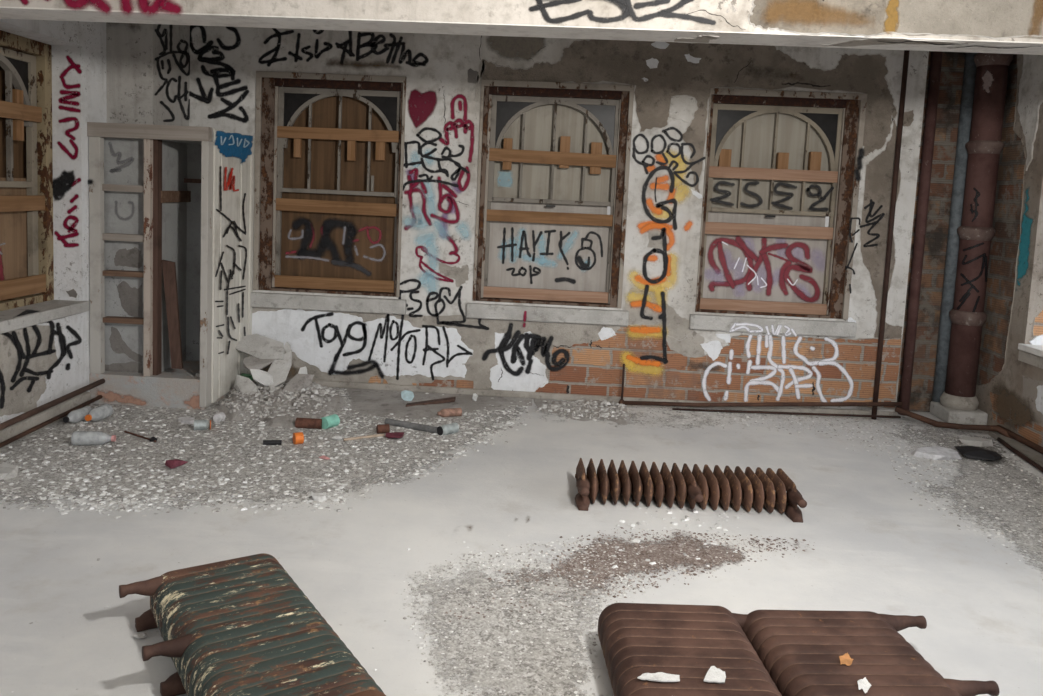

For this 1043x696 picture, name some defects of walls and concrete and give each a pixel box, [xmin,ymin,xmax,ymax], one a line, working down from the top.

rust [884,0,899,34]
flaking render [252,0,1043,467]
peeling [114,247,143,269]
peeling [117,281,143,318]
peeling [0,325,58,417]
peeling [105,326,143,373]
peeling [27,460,347,519]